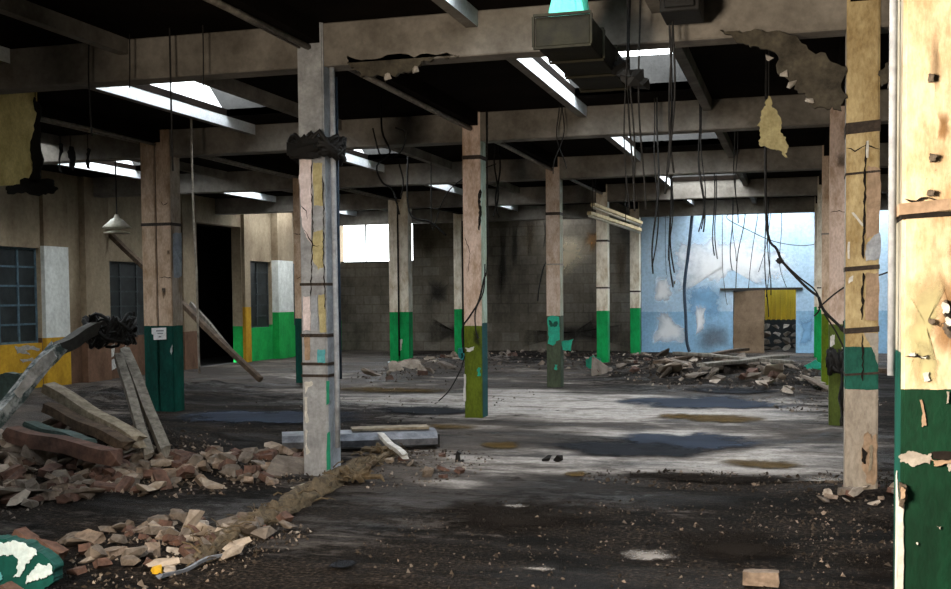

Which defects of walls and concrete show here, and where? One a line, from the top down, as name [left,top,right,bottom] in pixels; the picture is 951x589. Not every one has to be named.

spalling [347,53,459,80]
spalling [720,29,847,112]
spalling [878,62,889,89]
crack [832,142,878,320]
peeling [656,280,676,299]
peeling [547,316,560,346]
peeling [655,315,683,341]
peeling [696,310,704,331]
spalling [928,300,951,339]
peeling [15,345,41,362]
peeling [895,451,951,589]